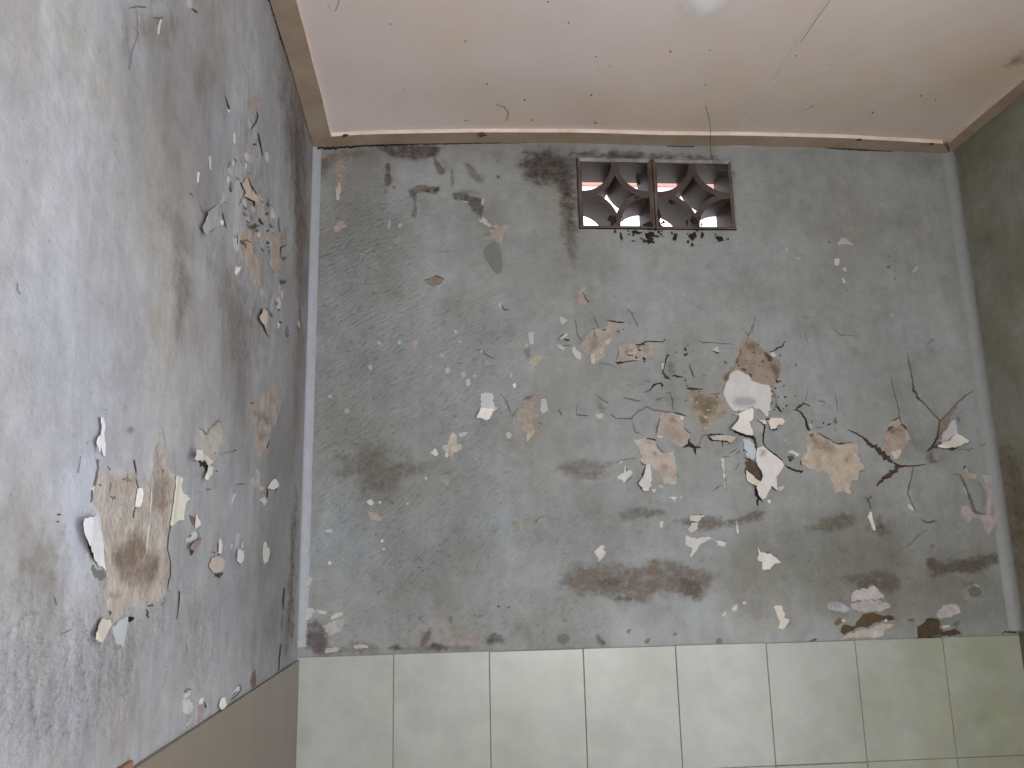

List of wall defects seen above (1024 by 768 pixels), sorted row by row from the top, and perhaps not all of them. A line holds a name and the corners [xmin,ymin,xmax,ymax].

damp [379,145,439,159]
damp [409,186,483,217]
peeling [201,152,300,337]
crack [770,317,856,365]
crack [559,315,803,473]
spalling [617,335,785,506]
crack [793,353,986,557]
peeling [83,409,202,647]
damp [564,560,711,601]
damp [927,556,998,572]
spalling [834,611,898,640]
spalling [914,600,964,638]